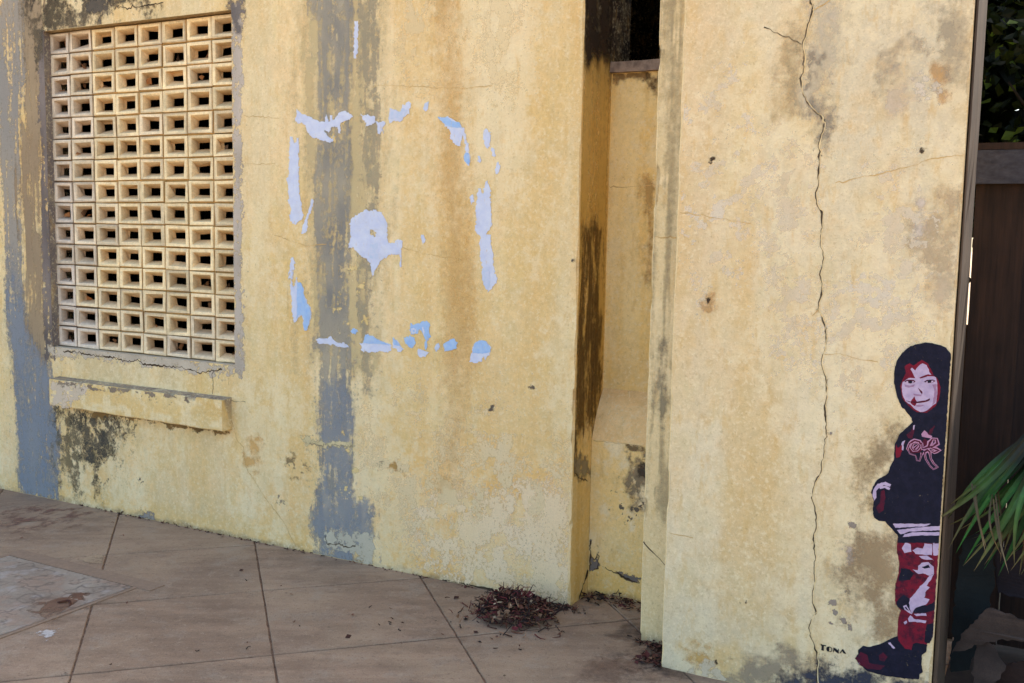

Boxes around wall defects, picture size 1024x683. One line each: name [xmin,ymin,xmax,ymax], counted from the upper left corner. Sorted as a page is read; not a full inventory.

water stain [0,0,162,500]
water stain [307,0,604,603]
water stain [619,444,646,522]
crack [764,0,962,683]